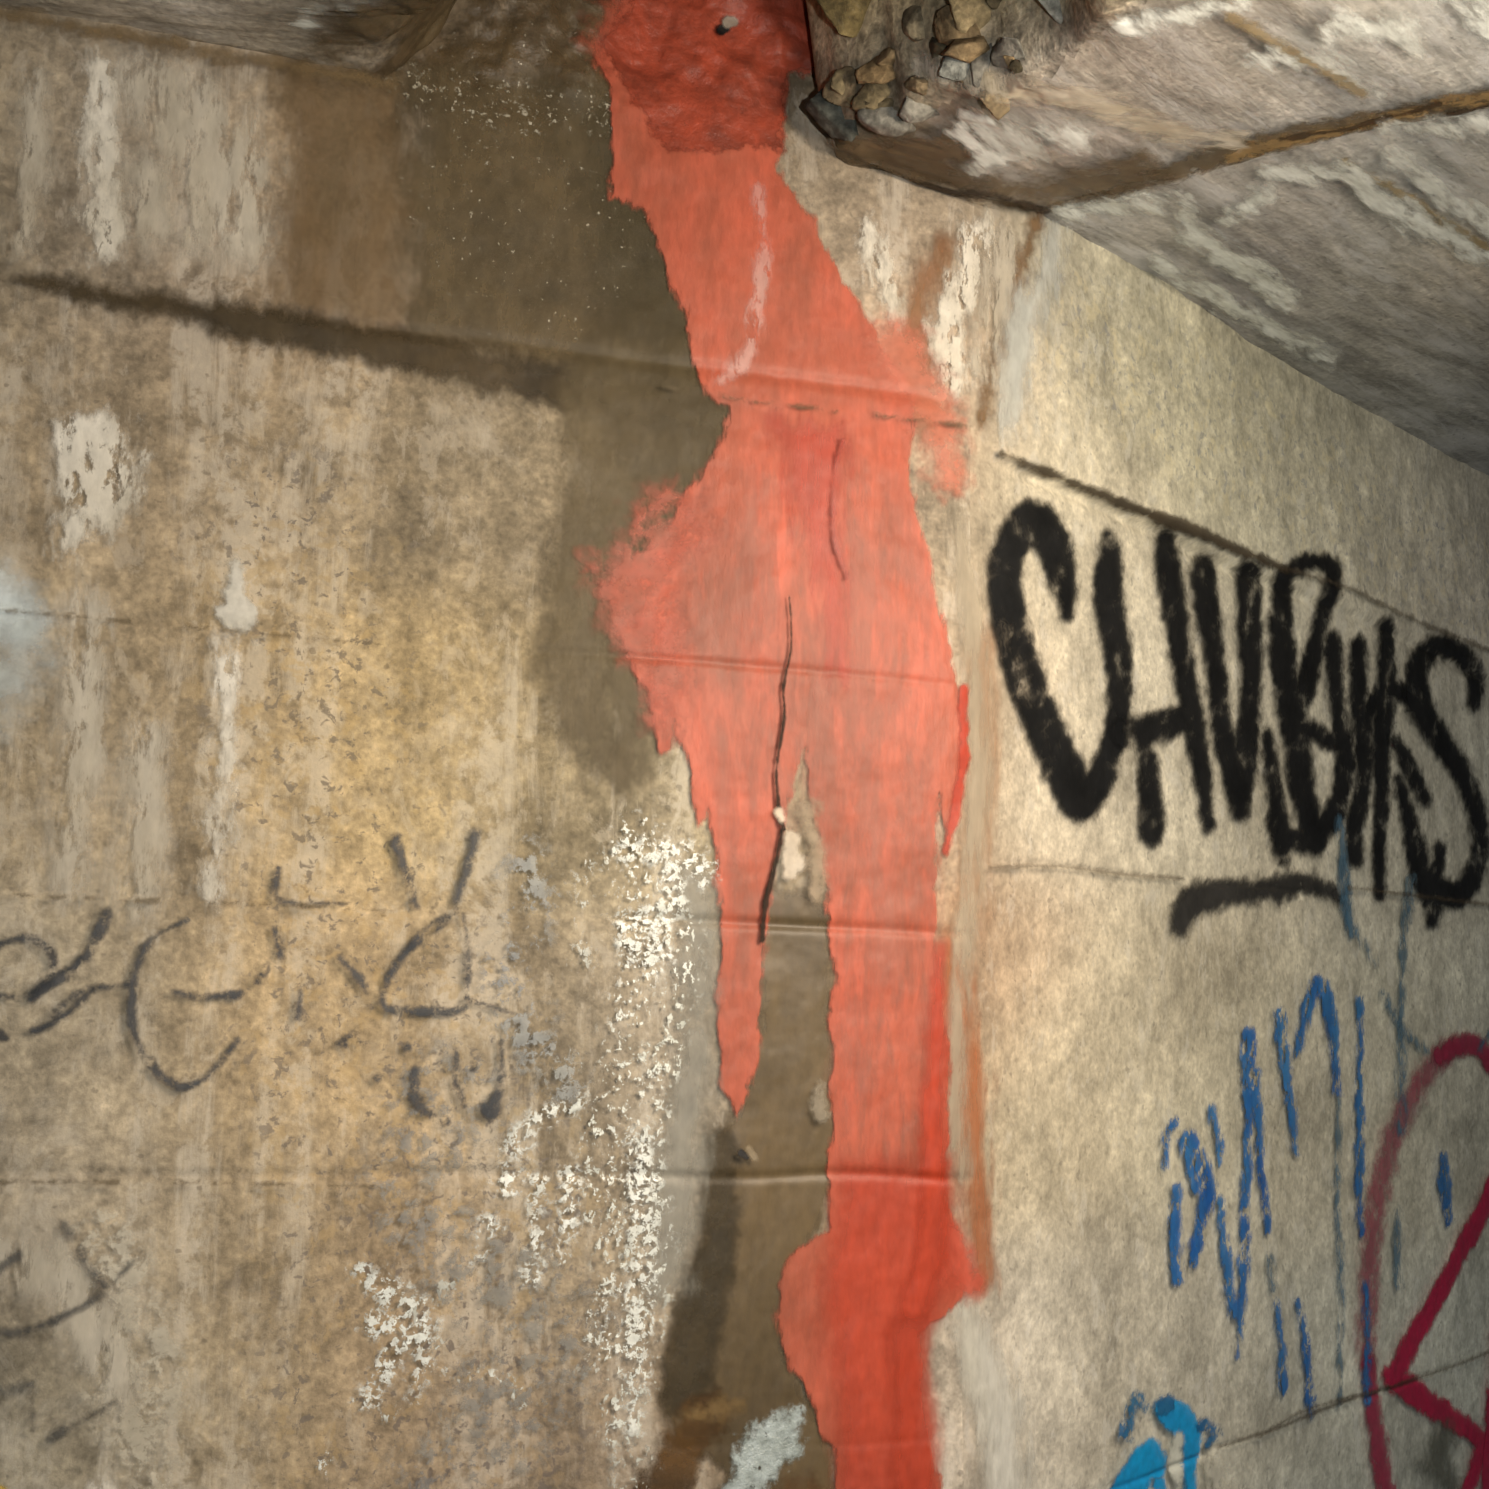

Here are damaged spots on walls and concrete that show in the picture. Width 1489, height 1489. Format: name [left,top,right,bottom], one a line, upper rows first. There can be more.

spalling [805,0,1025,142]
spalling [1038,0,1063,24]
crack [760,597,792,943]